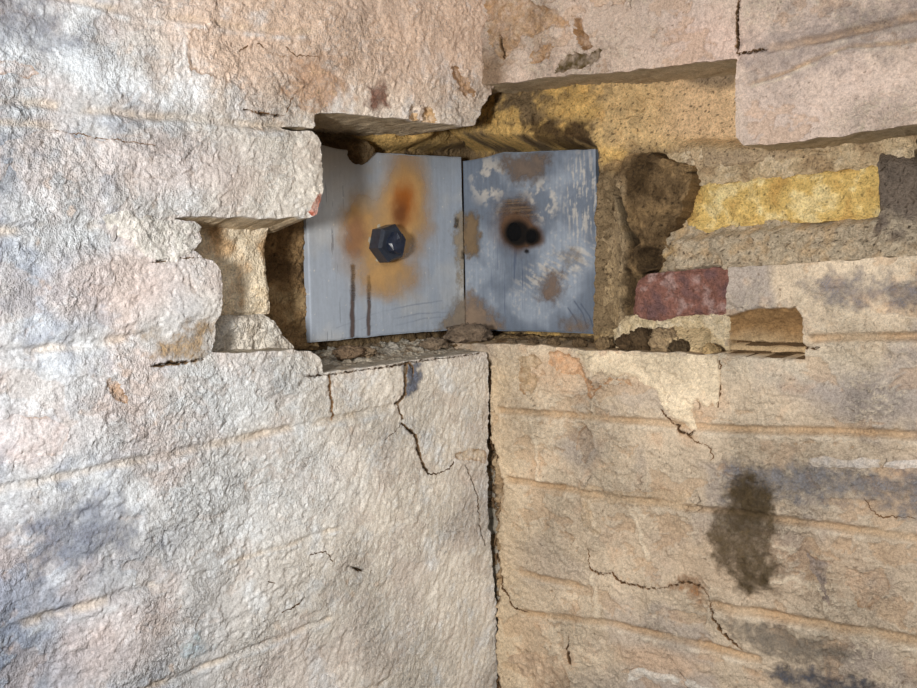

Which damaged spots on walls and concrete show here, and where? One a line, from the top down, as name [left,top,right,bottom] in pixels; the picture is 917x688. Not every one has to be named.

rust [343,157,427,338]
spalling [100,64,917,430]
crack [308,353,526,612]
crack [587,548,742,650]
crack [660,409,714,461]
leakage [707,465,917,595]